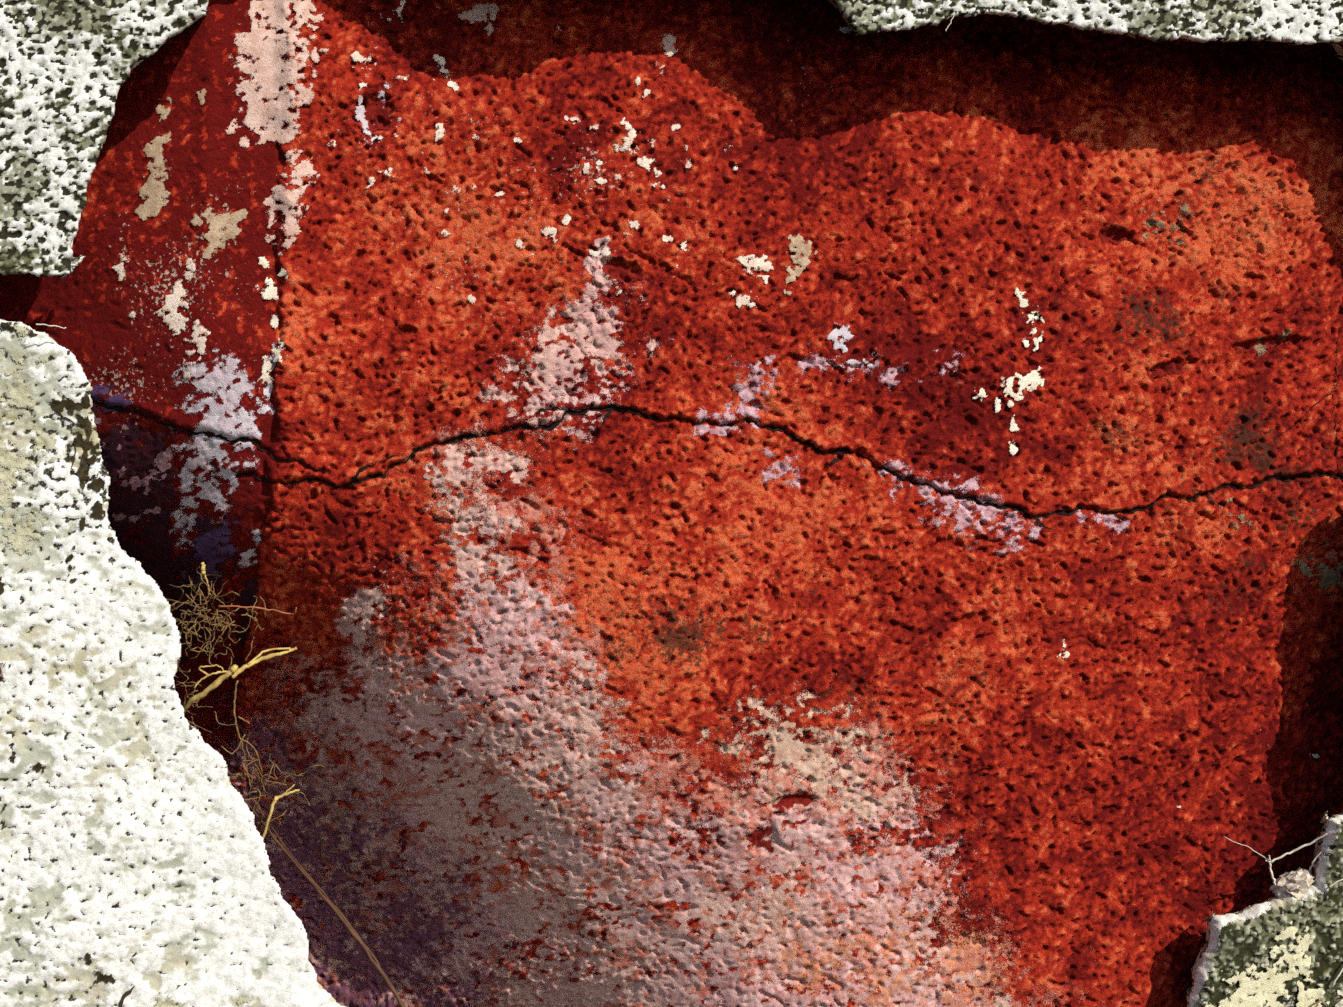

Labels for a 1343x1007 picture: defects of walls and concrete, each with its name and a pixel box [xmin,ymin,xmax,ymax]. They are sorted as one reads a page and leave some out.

peeling [135,97,172,221]
peeling [225,0,329,383]
spalling [351,51,409,143]
peeling [583,160,621,189]
peeling [614,117,655,154]
peeling [155,203,248,379]
crack [47,335,1343,530]
peeling [729,234,818,308]
peeling [827,320,875,368]
peeling [973,288,1044,455]
spalling [747,795,818,853]
peeling [1190,815,1343,1007]